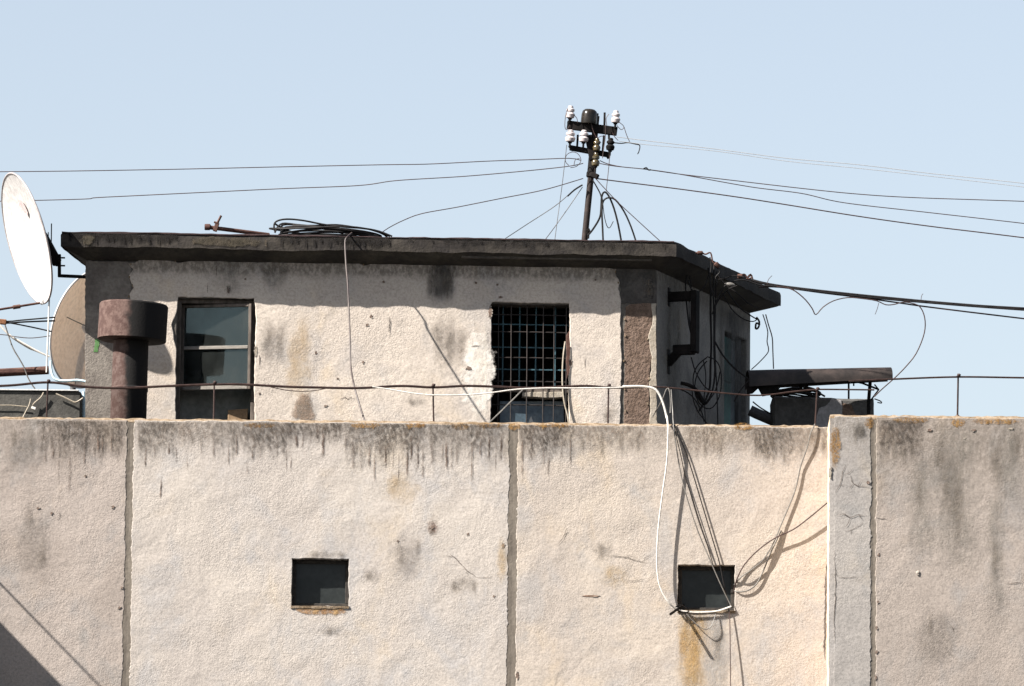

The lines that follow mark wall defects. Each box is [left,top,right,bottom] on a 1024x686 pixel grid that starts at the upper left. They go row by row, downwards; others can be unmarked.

water stain [431,265,452,296]
water stain [41,420,123,478]
water stain [139,422,188,465]
water stain [213,393,571,479]
water stain [750,425,793,453]
water stain [880,419,922,448]
corrosion [684,617,703,684]